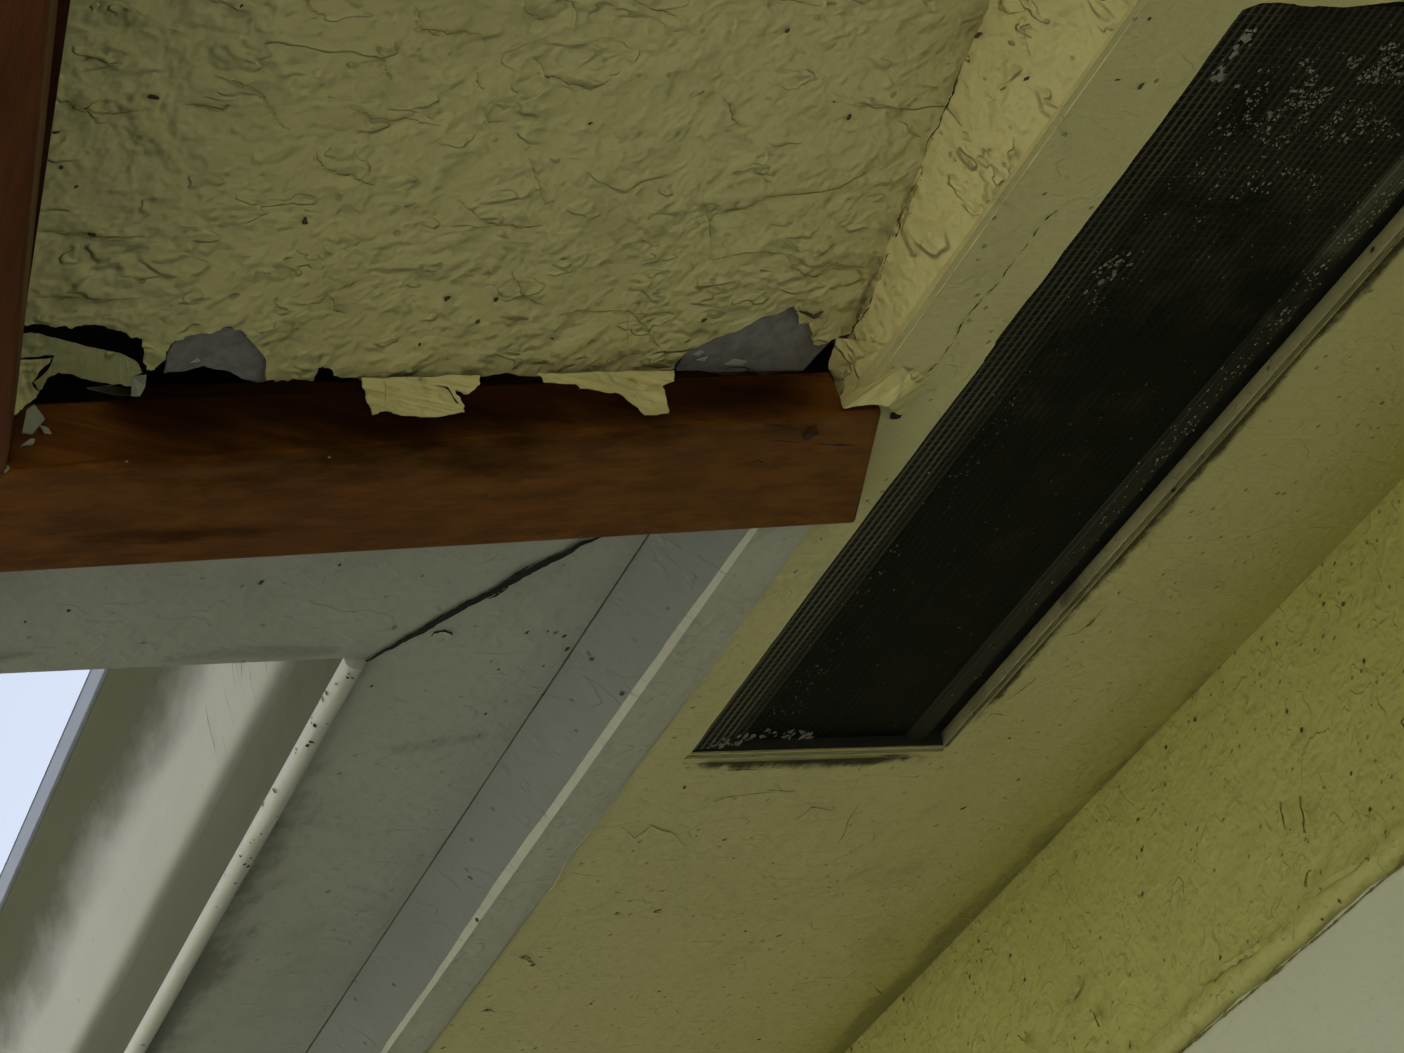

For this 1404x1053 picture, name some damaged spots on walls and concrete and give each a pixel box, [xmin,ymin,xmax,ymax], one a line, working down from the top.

peeling [14,327,266,447]
peeling [361,372,480,417]
spalling [537,303,929,415]
crack [366,537,601,662]